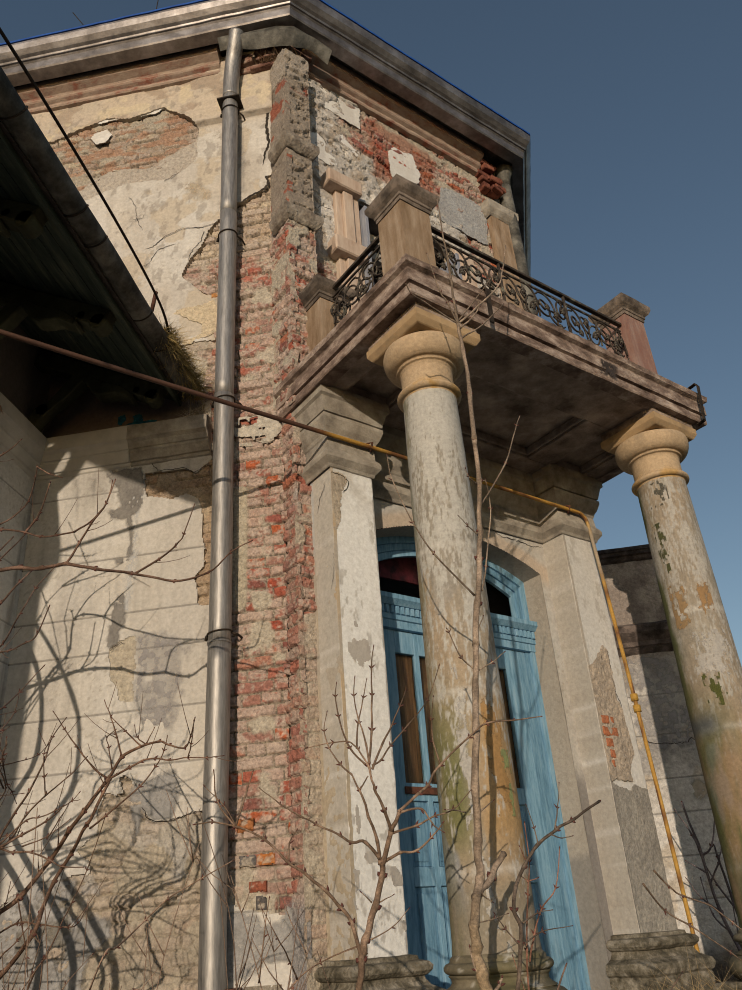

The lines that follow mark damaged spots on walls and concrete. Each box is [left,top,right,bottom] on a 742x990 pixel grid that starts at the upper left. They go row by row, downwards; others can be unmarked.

spalling [50,109,199,200]
spalling [475,158,506,200]
crack [125,198,216,266]
flaking render [183,221,220,298]
flaking render [145,331,216,605]
leakage [107,468,145,570]
flaking render [227,177,294,915]
leakage [107,583,130,647]
leakage [135,634,180,727]
spalling [589,645,634,782]